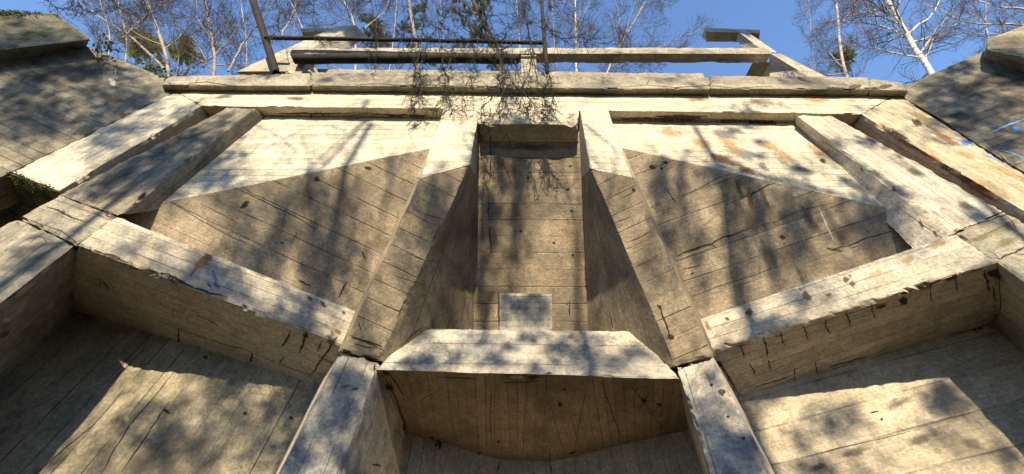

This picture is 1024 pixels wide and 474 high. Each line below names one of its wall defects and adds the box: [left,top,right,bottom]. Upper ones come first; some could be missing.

crack [177,315,308,375]
crack [657,304,674,339]